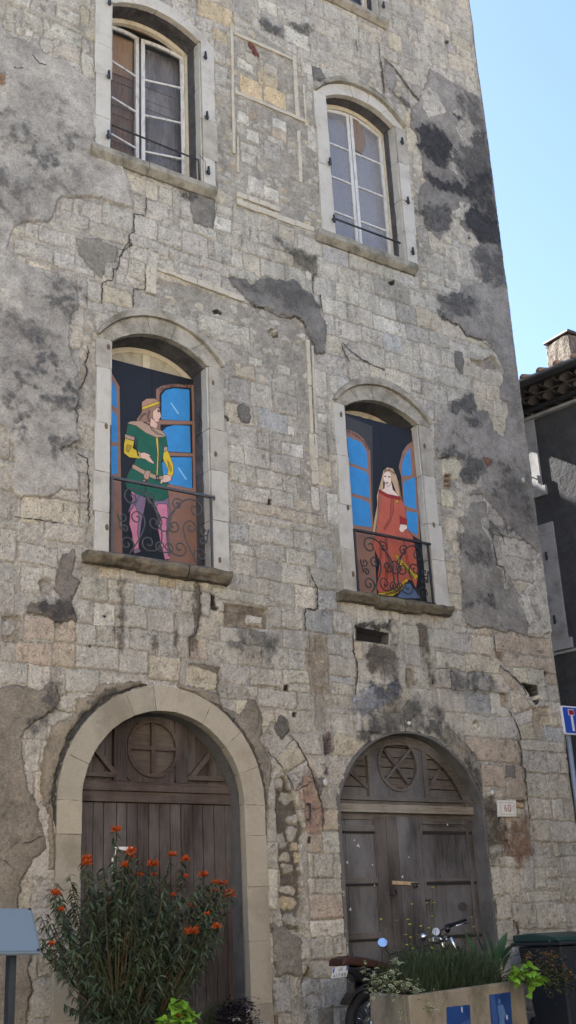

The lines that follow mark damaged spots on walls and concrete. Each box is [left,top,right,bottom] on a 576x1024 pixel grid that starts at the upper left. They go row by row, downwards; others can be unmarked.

peeling [0,27,133,500]
crack [101,198,147,305]
peeling [229,276,327,356]
peeling [410,68,552,639]
peeling [0,681,61,909]
spalling [272,773,307,935]
leakage [351,644,447,743]
leakage [417,623,429,661]
crack [493,633,530,819]
peeling [0,955,34,1024]